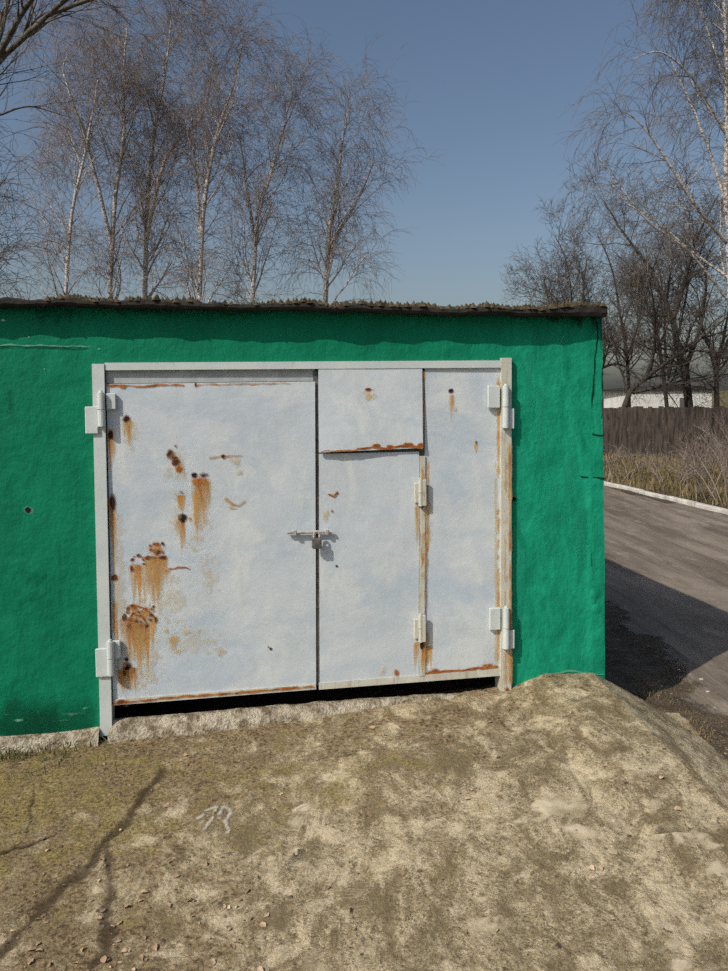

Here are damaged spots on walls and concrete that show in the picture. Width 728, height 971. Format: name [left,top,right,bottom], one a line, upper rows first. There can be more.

corrosion [108,415,131,455]
corrosion [166,445,209,543]
corrosion [113,542,314,705]
corrosion [414,408,512,691]